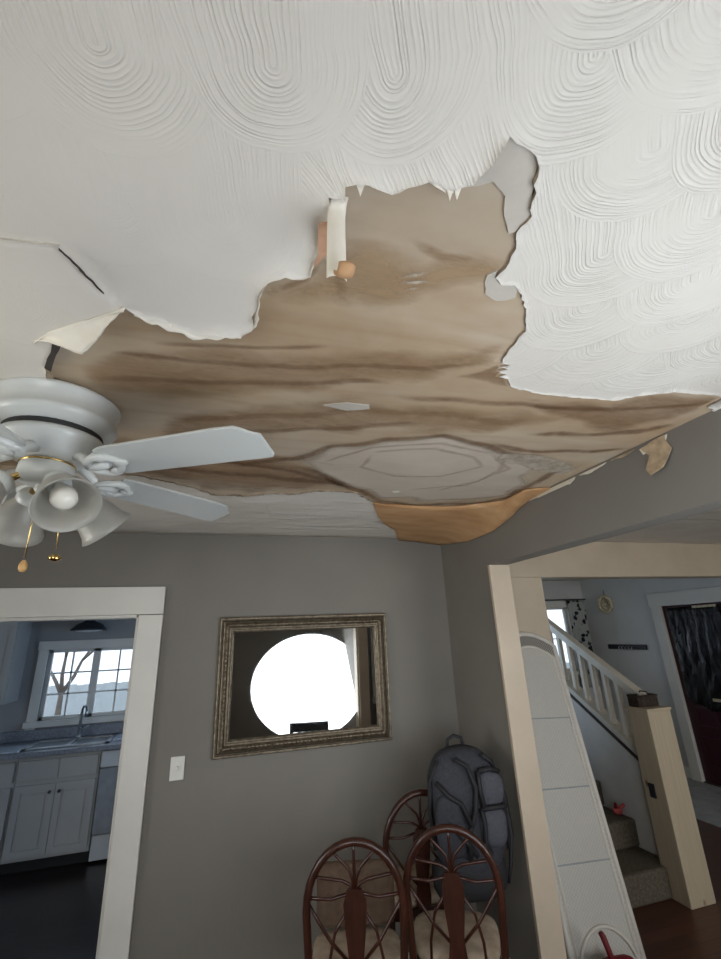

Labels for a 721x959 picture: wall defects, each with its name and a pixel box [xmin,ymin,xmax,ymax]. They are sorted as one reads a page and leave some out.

crack [0,237,104,294]
peeling [323,402,370,411]
water stain [249,435,570,505]
peeling [639,434,672,475]